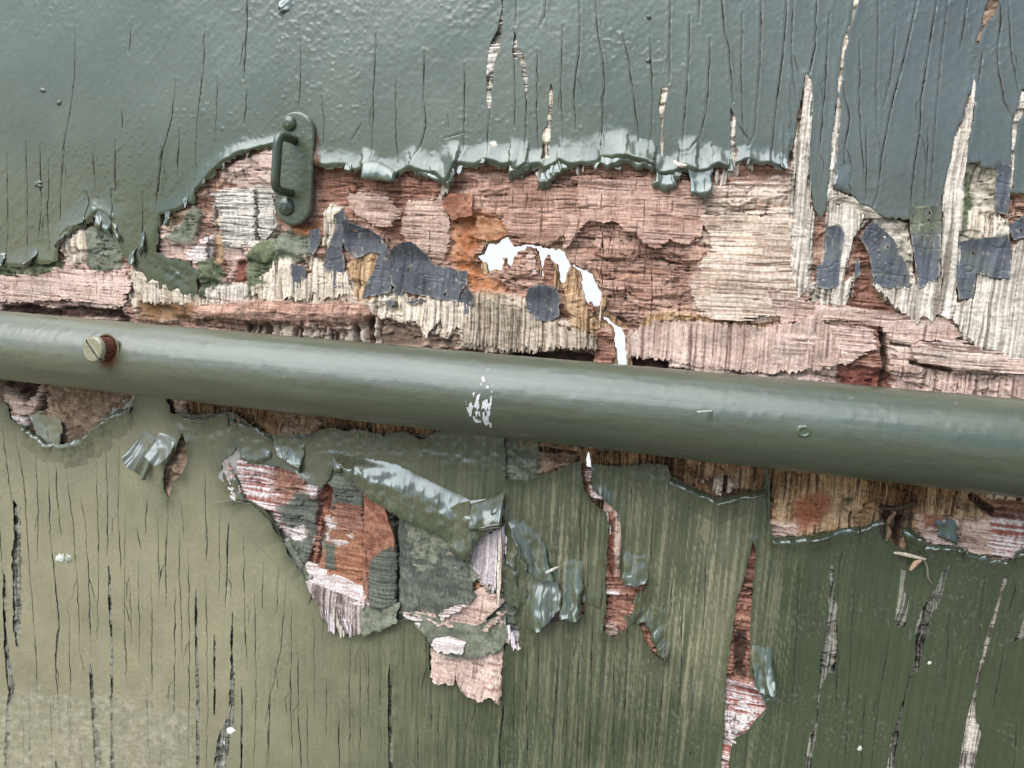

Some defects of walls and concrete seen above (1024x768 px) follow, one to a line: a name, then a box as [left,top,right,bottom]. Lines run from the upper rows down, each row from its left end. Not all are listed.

crack [6,30,116,259]
crack [141,30,218,234]
crack [240,1,248,120]
peeling [278,0,295,16]
peeling [0,74,1024,399]
crack [354,0,1019,207]
peeling [0,376,603,705]
crack [0,429,706,768]
peeling [504,438,1024,578]
peeling [750,645,783,724]
crack [764,476,950,768]
crack [958,577,1024,768]